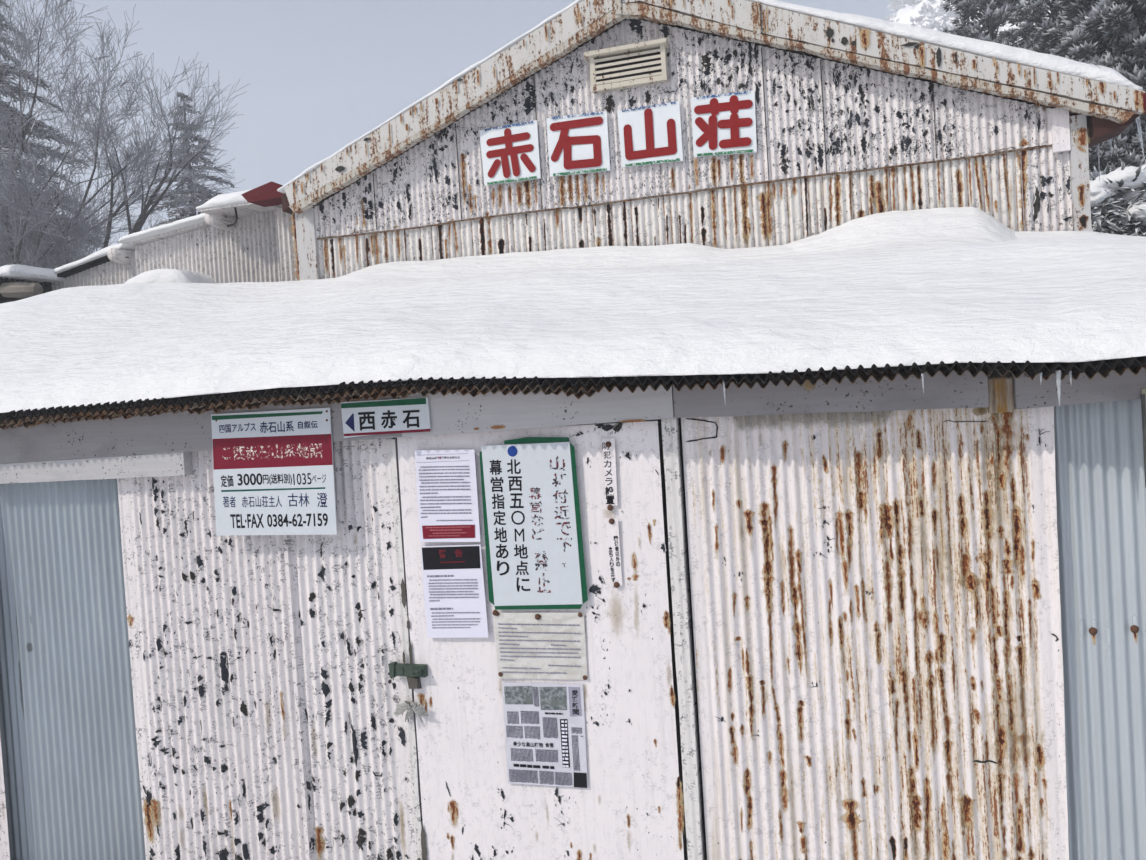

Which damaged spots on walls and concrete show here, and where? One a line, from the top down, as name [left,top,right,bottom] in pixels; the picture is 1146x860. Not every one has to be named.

peeling [667,33,956,174]
rust [461,153,639,255]
rust [654,154,808,247]
rust [824,164,923,231]
peeling [139,477,199,541]
peeling [146,555,282,803]
peeling [298,539,332,626]
peeling [309,630,410,860]
rust [727,441,808,860]
rust [828,429,975,860]
rust [957,412,1046,860]
peeling [173,778,279,860]